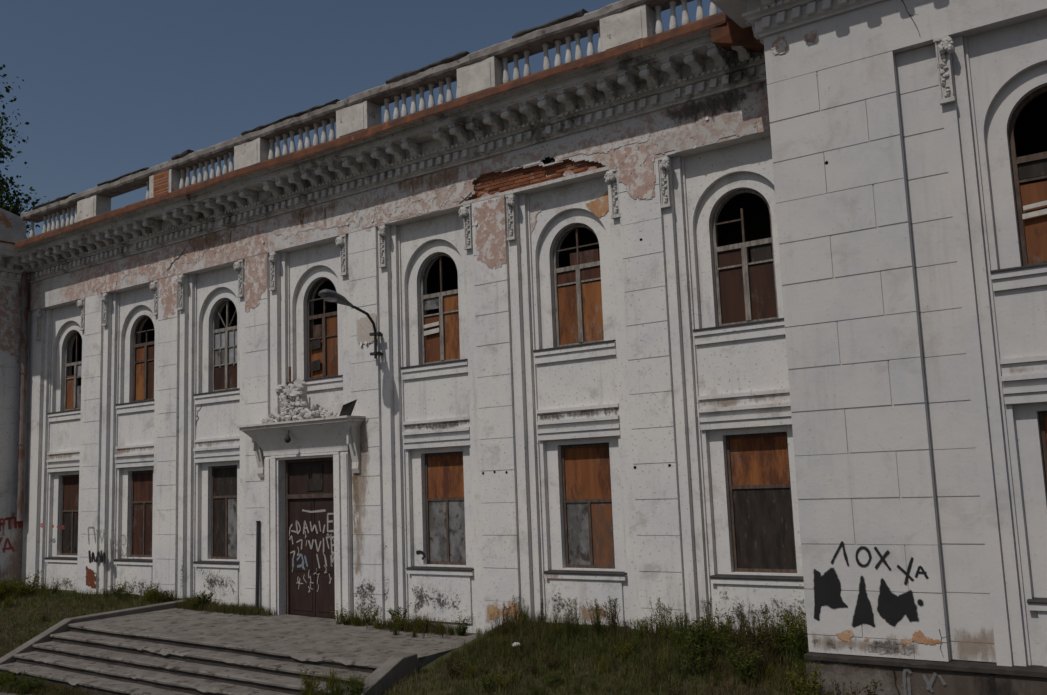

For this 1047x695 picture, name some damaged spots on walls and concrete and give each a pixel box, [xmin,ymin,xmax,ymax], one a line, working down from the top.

peeling [87,110,758,320]
damp [352,424,389,616]